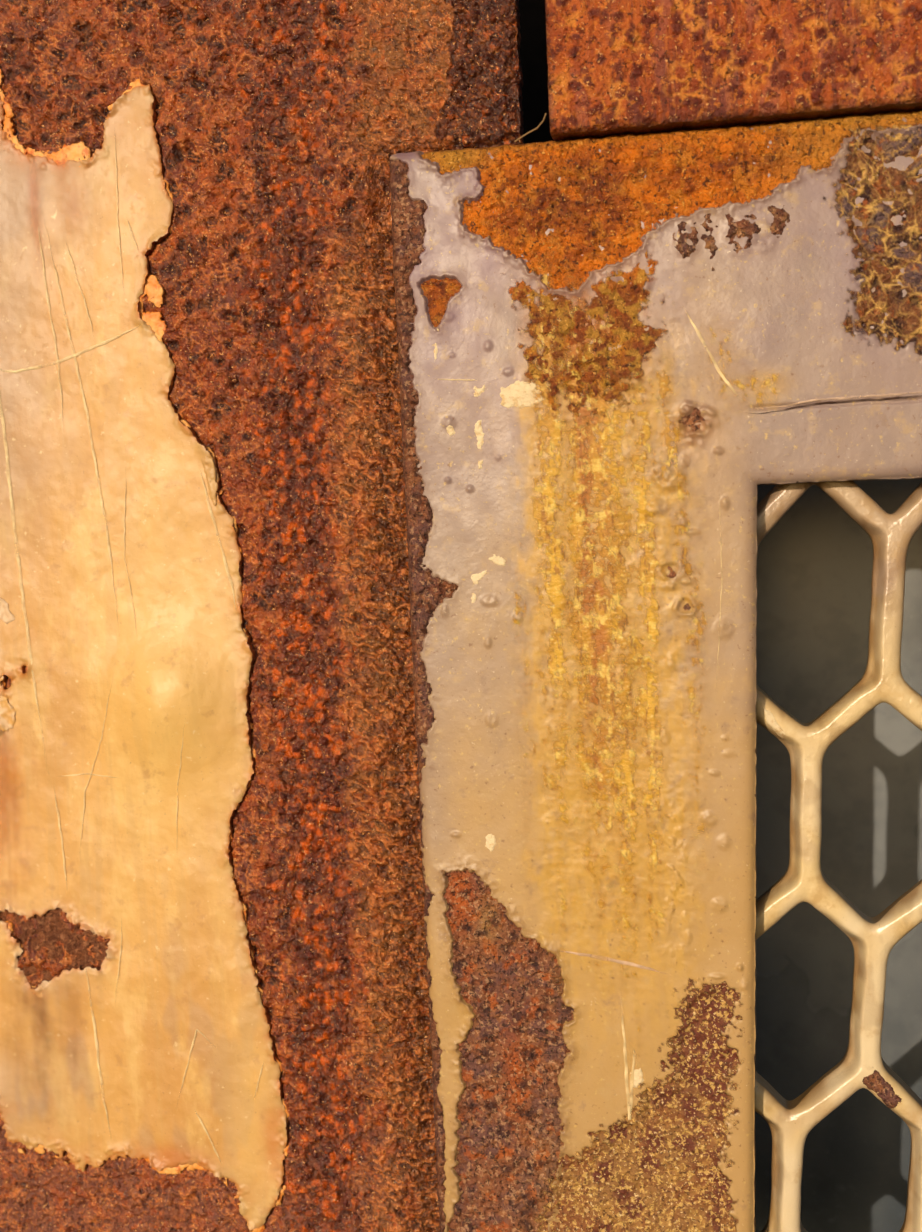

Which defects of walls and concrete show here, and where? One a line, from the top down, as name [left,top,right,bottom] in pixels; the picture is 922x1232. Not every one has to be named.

crack [687,315,734,391]
crack [758,391,922,414]
corrosion [421,110,922,939]
peeling [0,68,291,1232]
corrosion [389,160,743,1232]
corrosion [0,908,107,984]
peeling [630,1068,644,1088]
corrosion [862,1070,902,1109]